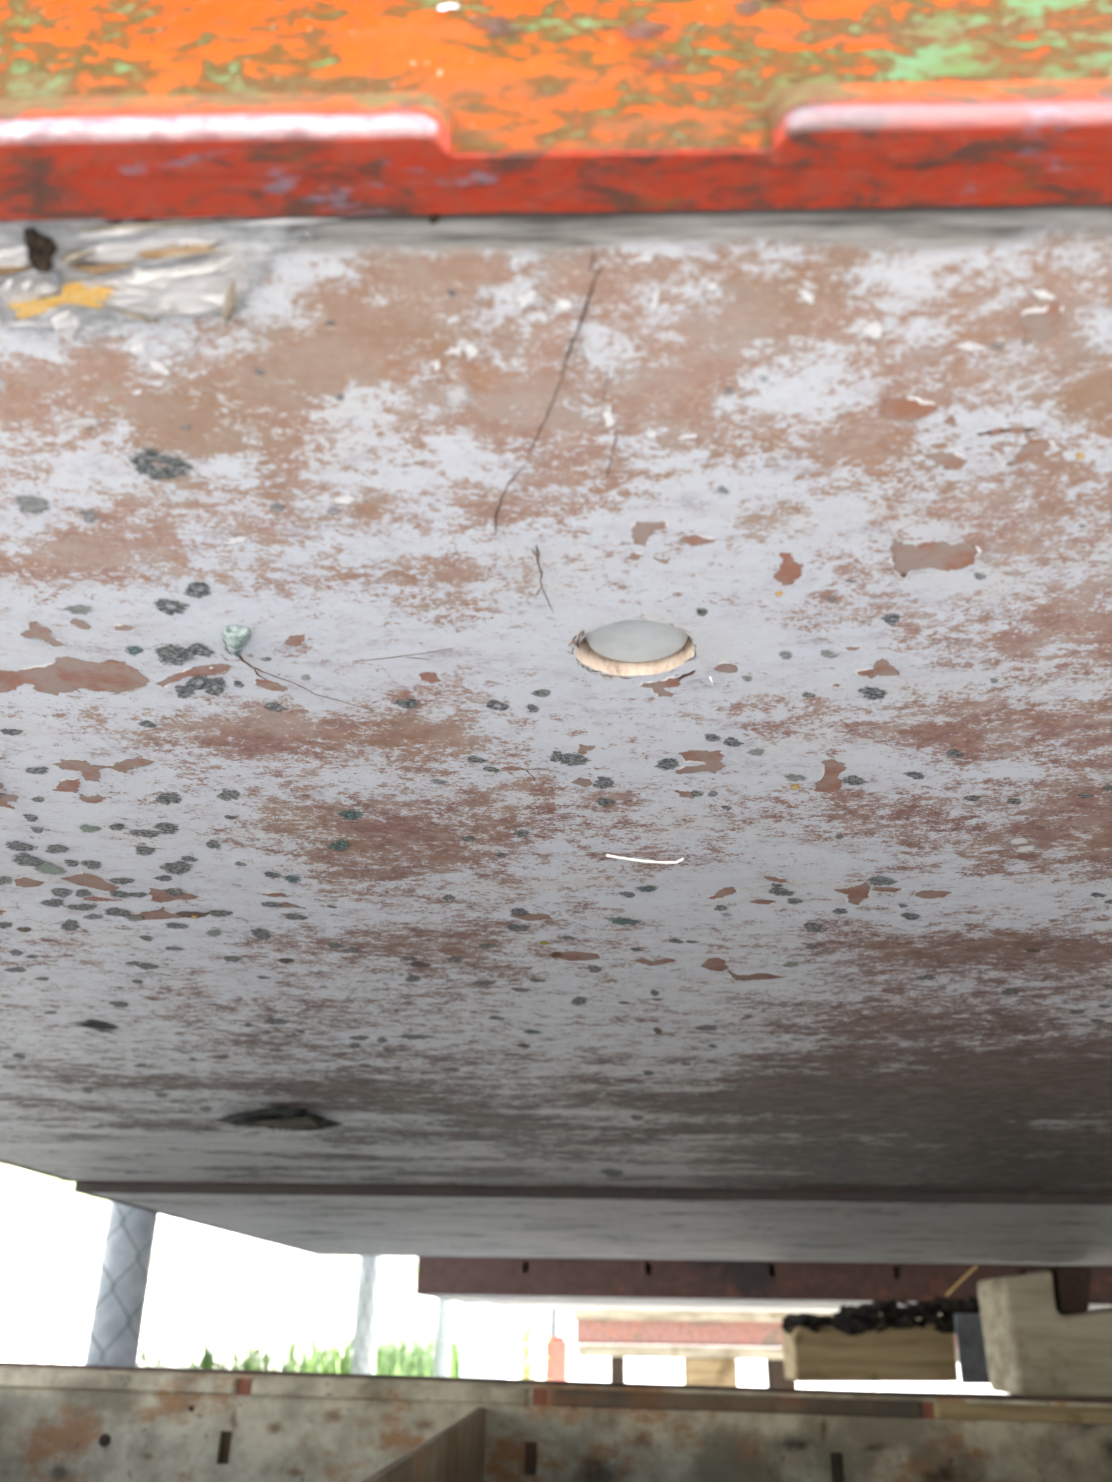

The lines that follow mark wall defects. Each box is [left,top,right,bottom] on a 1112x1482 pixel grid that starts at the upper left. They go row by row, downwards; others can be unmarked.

spalling [0,216,344,377]
crack [495,249,618,534]
crack [532,546,554,613]
peeling [889,540,983,579]
peeling [0,618,232,696]
spalling [218,1108,344,1131]